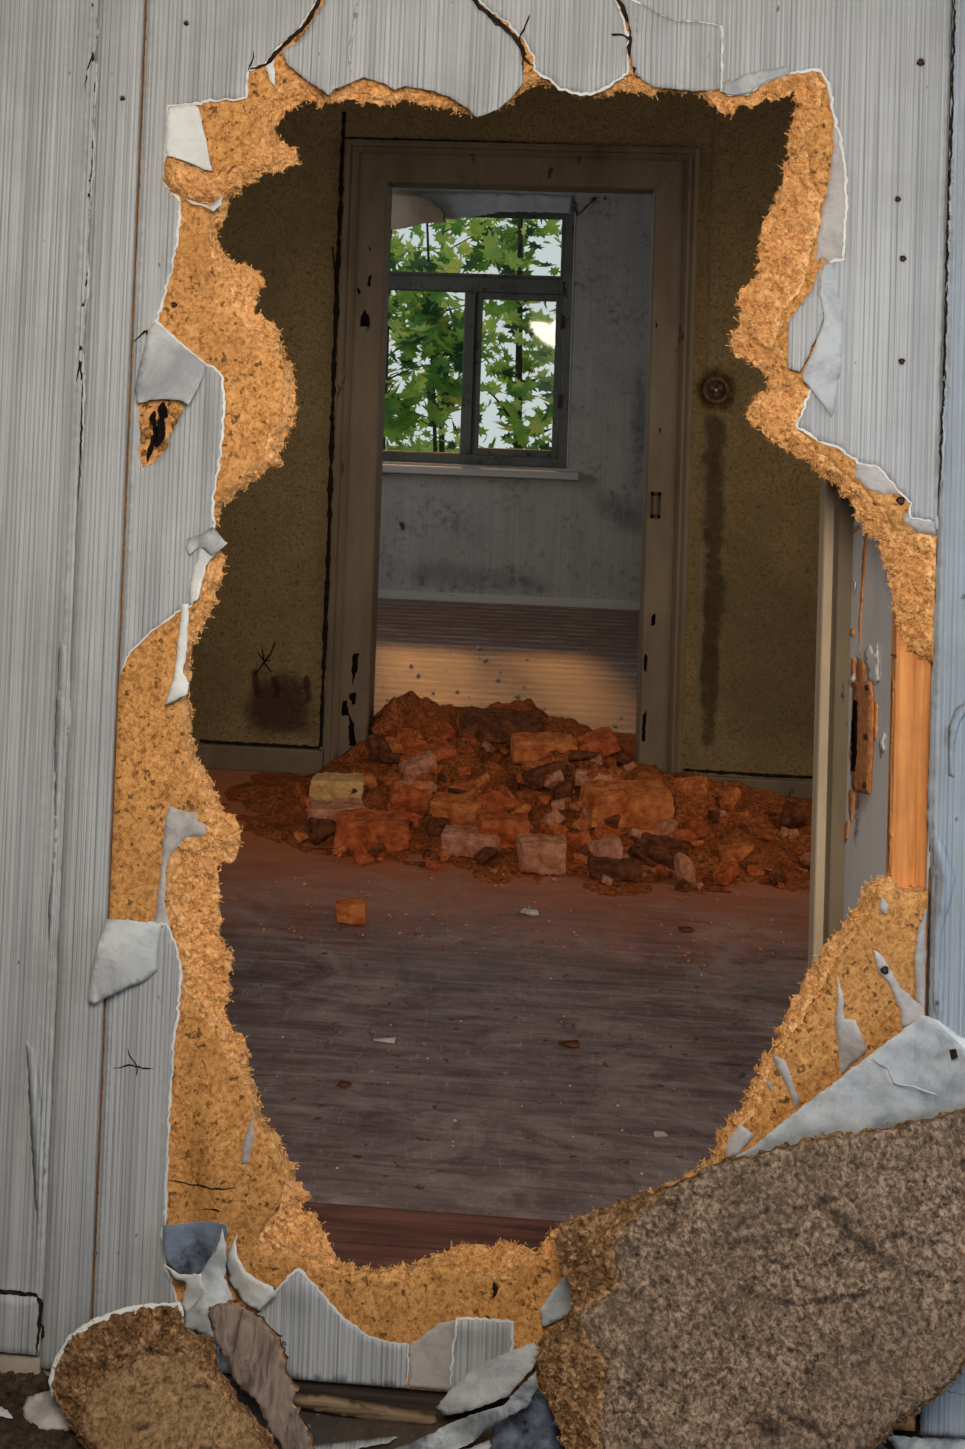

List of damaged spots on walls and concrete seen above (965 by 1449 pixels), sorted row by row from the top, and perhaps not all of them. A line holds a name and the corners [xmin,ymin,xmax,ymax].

crack [473,0,533,74]
spalling [138,399,182,468]
leakage [701,417,726,744]
leakage [251,670,311,731]
spalling [166,66,965,1449]